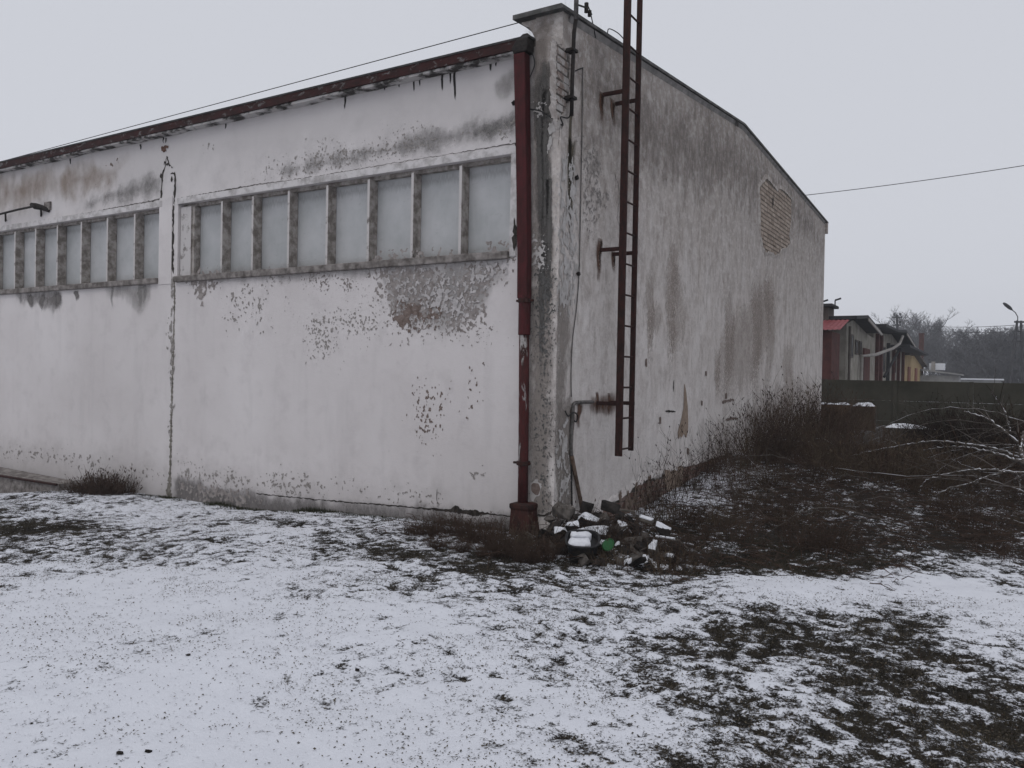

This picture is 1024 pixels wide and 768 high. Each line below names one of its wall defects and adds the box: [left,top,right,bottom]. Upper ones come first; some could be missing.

leakage [253,121,441,181]
flaking render [757,174,792,260]
crack [103,137,514,497]
peeling [166,240,516,389]
peeling [406,362,484,445]
corrosion [557,392,616,504]
flaking render [599,384,734,519]